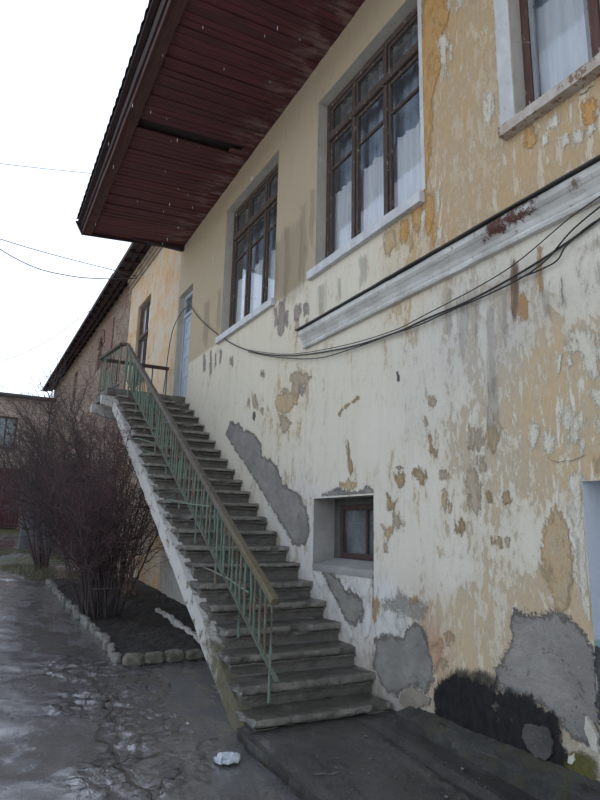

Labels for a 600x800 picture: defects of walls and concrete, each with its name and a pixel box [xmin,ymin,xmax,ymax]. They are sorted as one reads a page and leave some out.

rust [481,197,538,243]
peeling [274,370,312,436]
peeling [528,327,600,456]
flaking render [226,421,311,547]
peeling [380,493,405,554]
peeling [393,465,427,488]
peeling [438,469,467,537]
peeling [463,419,513,519]
flaking render [312,571,456,709]
flaking render [490,456,600,753]
water stain [433,668,569,769]
flaking render [521,723,555,761]